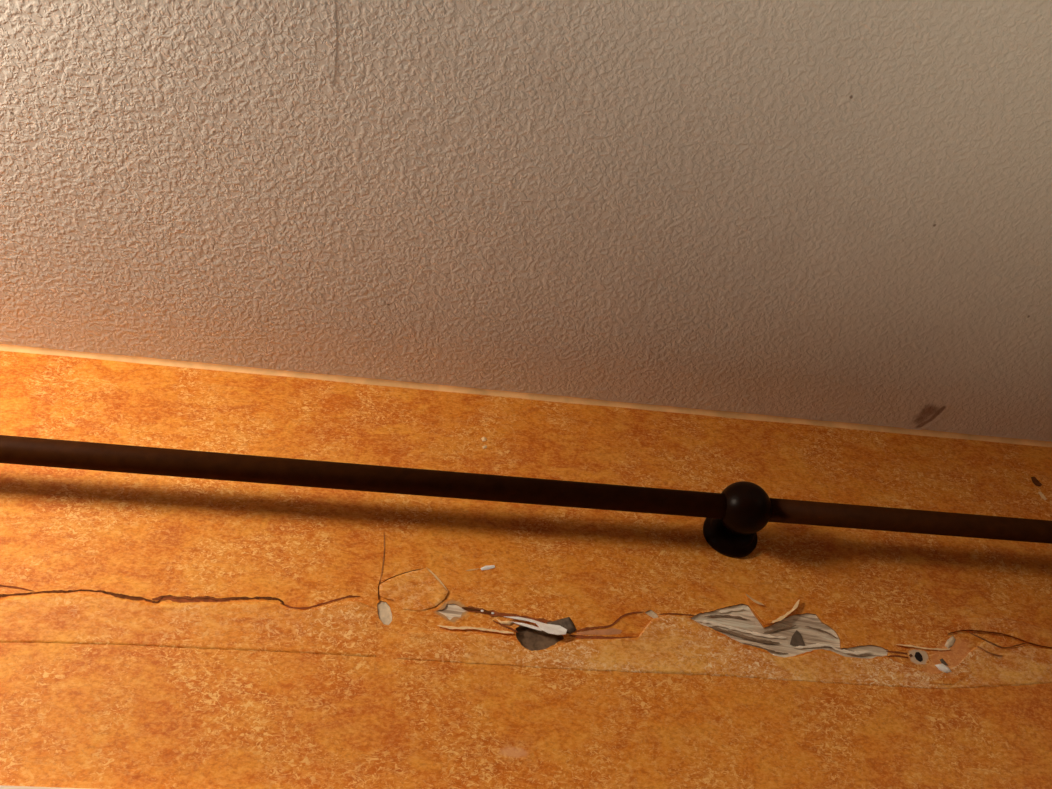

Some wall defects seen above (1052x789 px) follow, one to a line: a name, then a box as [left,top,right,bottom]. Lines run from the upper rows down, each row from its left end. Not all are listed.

crack [0,585,359,609]
flaking render [504,616,576,651]
crack [437,606,696,639]
peeling [690,594,975,684]
crack [947,630,1052,657]